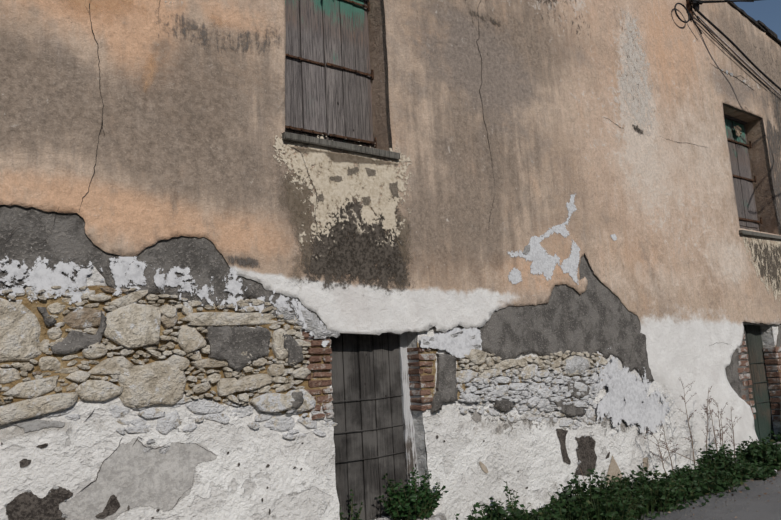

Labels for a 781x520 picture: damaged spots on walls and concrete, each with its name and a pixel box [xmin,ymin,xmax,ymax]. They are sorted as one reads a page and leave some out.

leakage [166,14,207,45]
crack [79,3,105,211]
peeling [273,130,413,249]
leakage [766,92,781,227]
spalling [0,205,340,348]
peeling [9,419,65,432]
peeling [4,437,217,520]
spalling [420,193,671,486]
spalling [725,329,756,419]
flaking render [763,324,781,422]